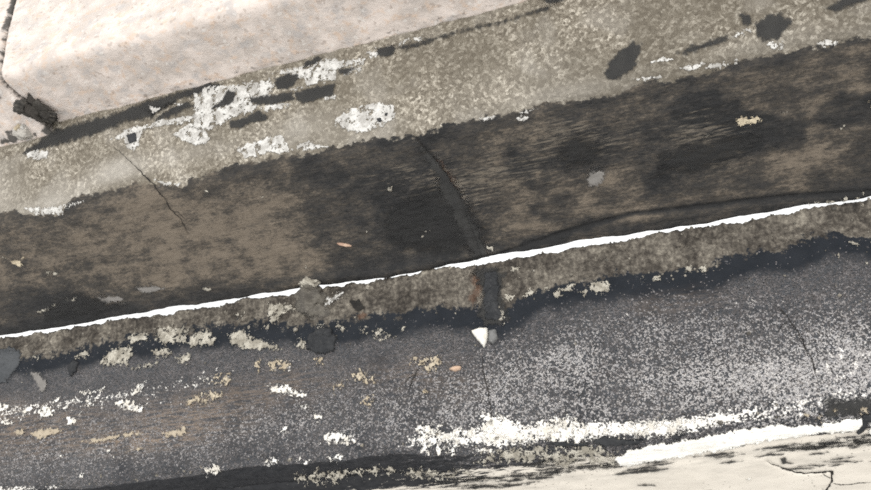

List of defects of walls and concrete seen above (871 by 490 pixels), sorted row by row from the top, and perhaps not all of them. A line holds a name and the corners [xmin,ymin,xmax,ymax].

peeling [110,47,378,151]
peeling [237,135,329,159]
leakage [549,137,605,186]
crack [115,148,187,231]
leakage [42,294,123,320]
leakage [31,372,47,392]
leakage [115,380,147,412]
leakage [14,427,62,439]
leakage [81,431,141,444]
leakage [694,445,746,464]
leakage [756,434,871,471]
crack [769,462,871,490]